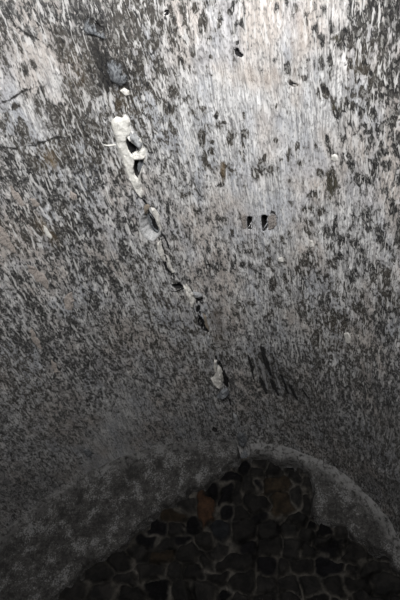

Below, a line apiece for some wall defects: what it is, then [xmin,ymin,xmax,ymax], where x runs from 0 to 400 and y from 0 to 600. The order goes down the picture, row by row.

flaking render [103,114,146,198]
crack [141,197,239,425]